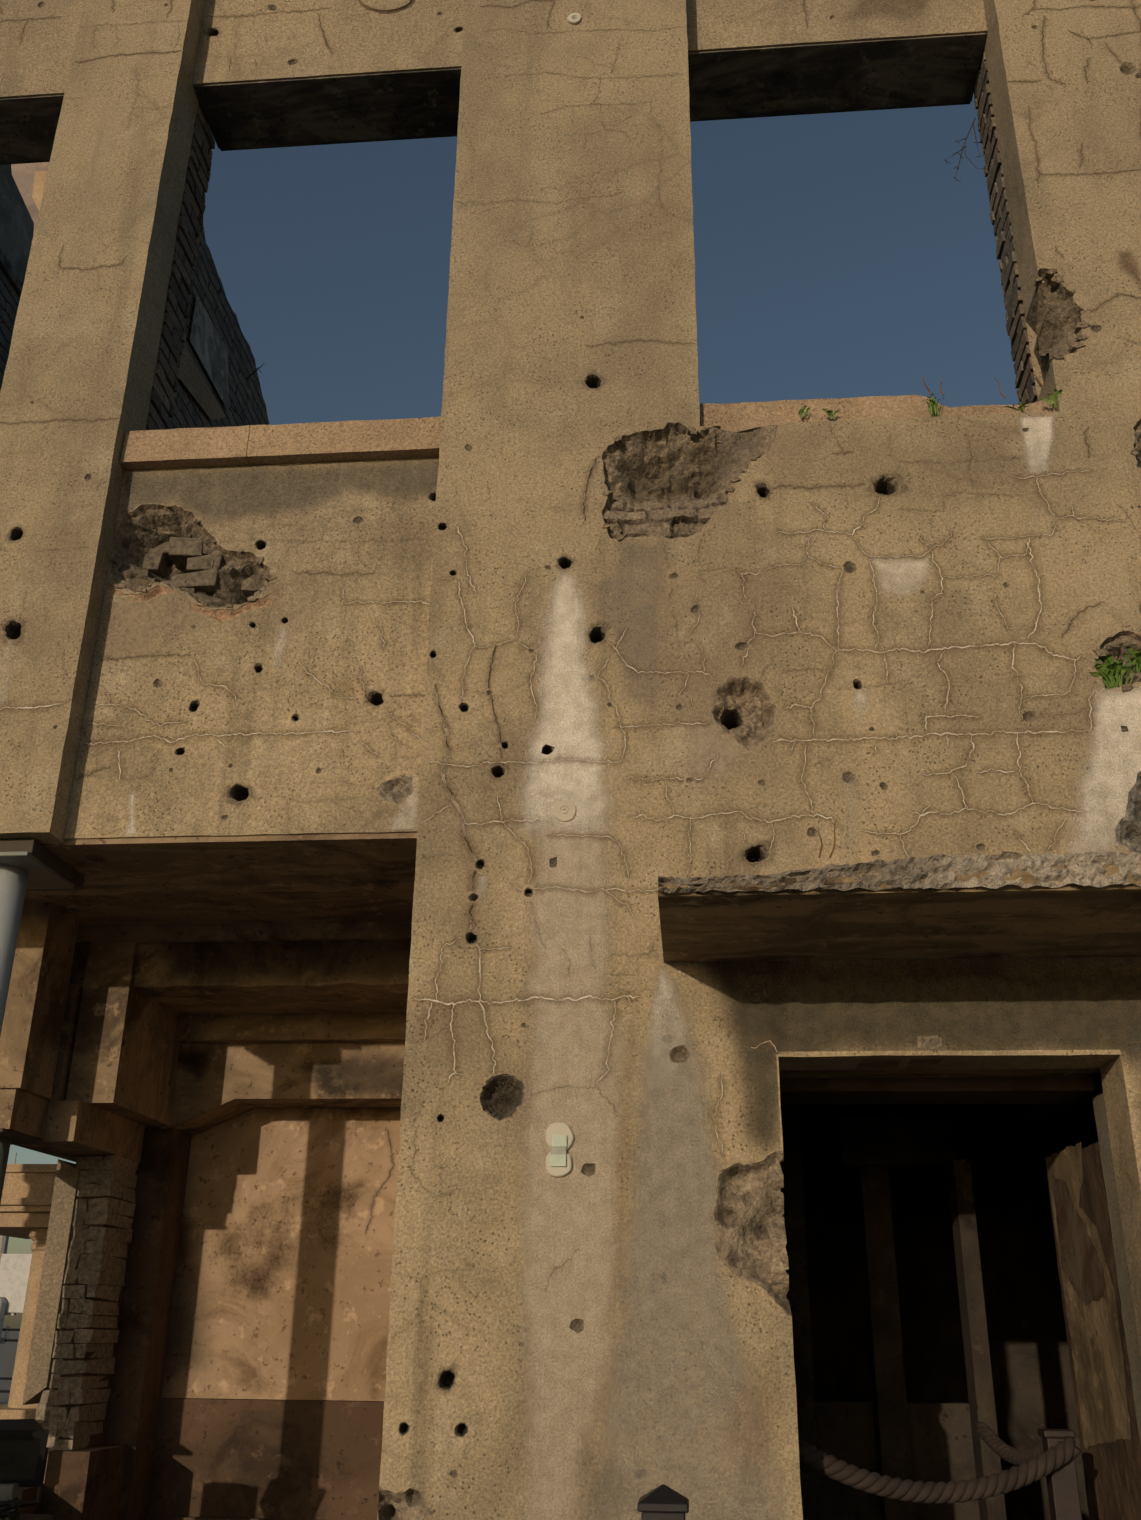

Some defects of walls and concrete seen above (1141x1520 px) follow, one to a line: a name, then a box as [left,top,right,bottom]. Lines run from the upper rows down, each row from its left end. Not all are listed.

crack [1010,0,1141,183]
peeling [1034,268,1102,361]
peeling [725,453,761,494]
spalling [1130,418,1141,469]
spalling [108,504,277,629]
spalling [1093,631,1141,692]
crack [0,423,1141,1234]
spalling [658,771,1141,893]
leakage [1079,689,1141,850]
leakage [524,575,764,1520]
spalling [713,1151,792,1316]